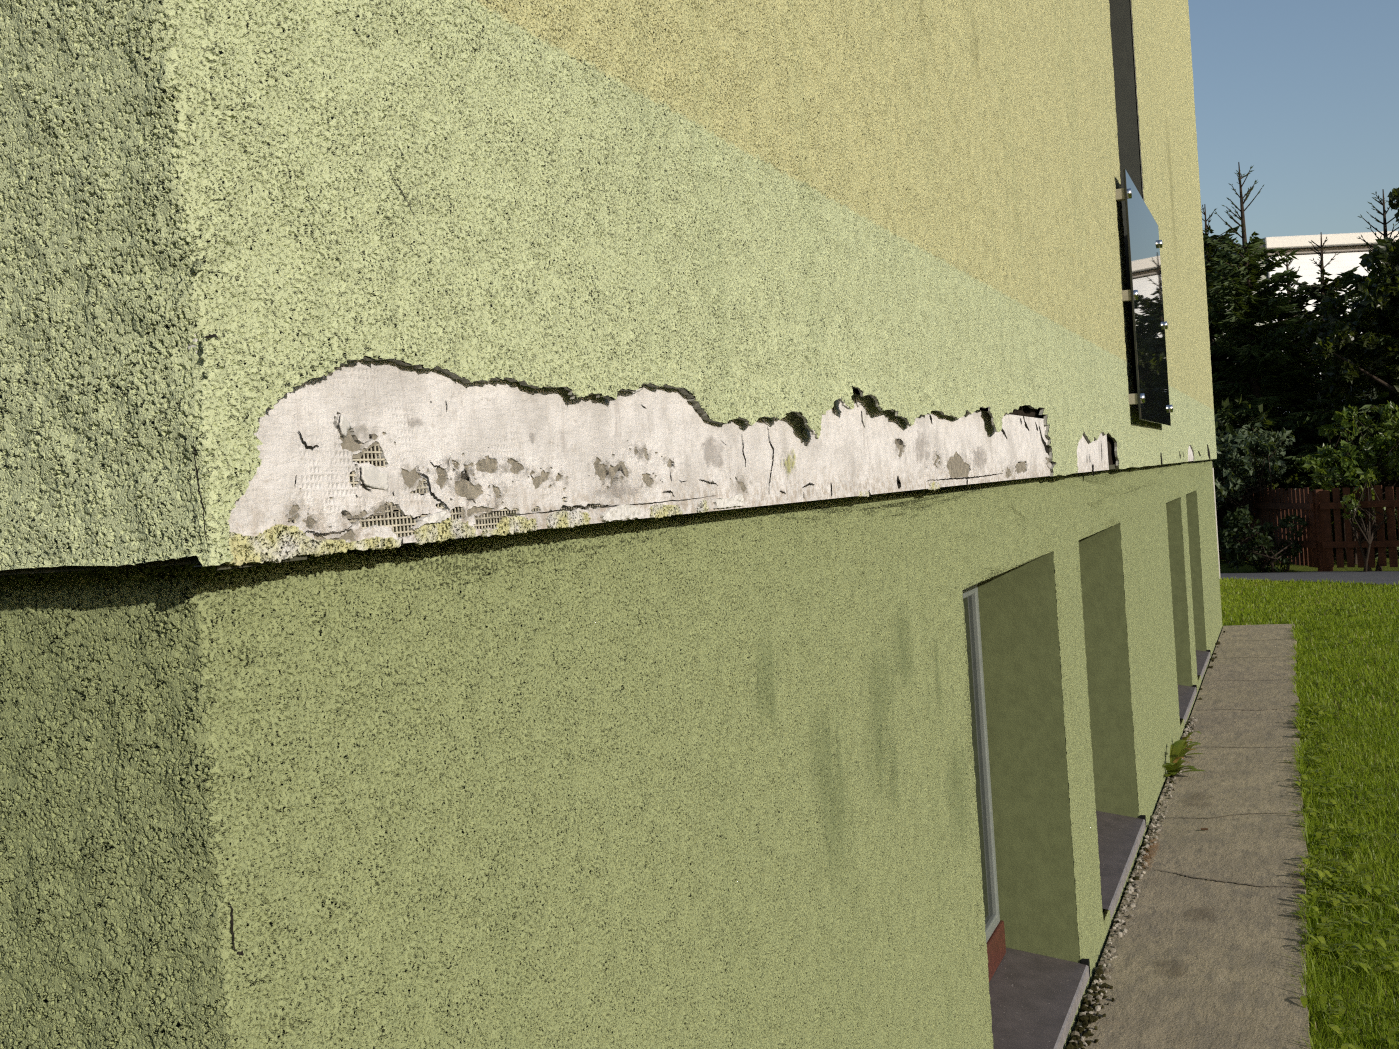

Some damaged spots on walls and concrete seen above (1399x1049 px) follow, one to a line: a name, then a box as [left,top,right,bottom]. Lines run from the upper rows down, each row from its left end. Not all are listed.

flaking render [223,356,1056,566]
flaking render [1077,433,1109,476]